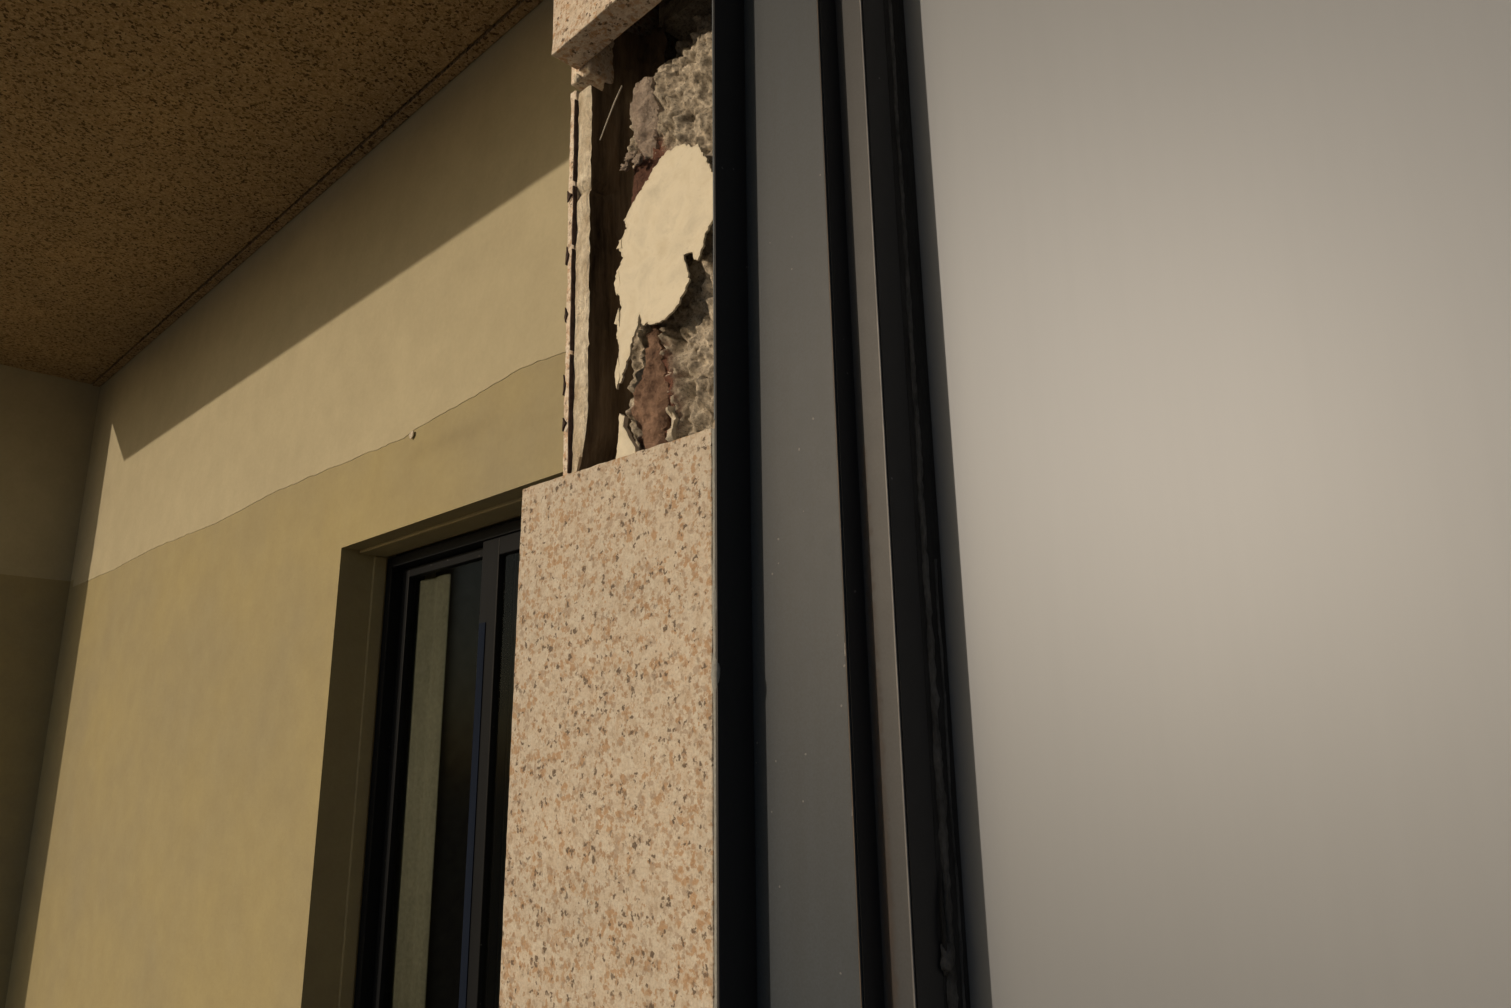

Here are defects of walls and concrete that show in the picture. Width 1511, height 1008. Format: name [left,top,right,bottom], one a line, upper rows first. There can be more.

spalling [602,0,713,326]
spalling [615,224,715,451]